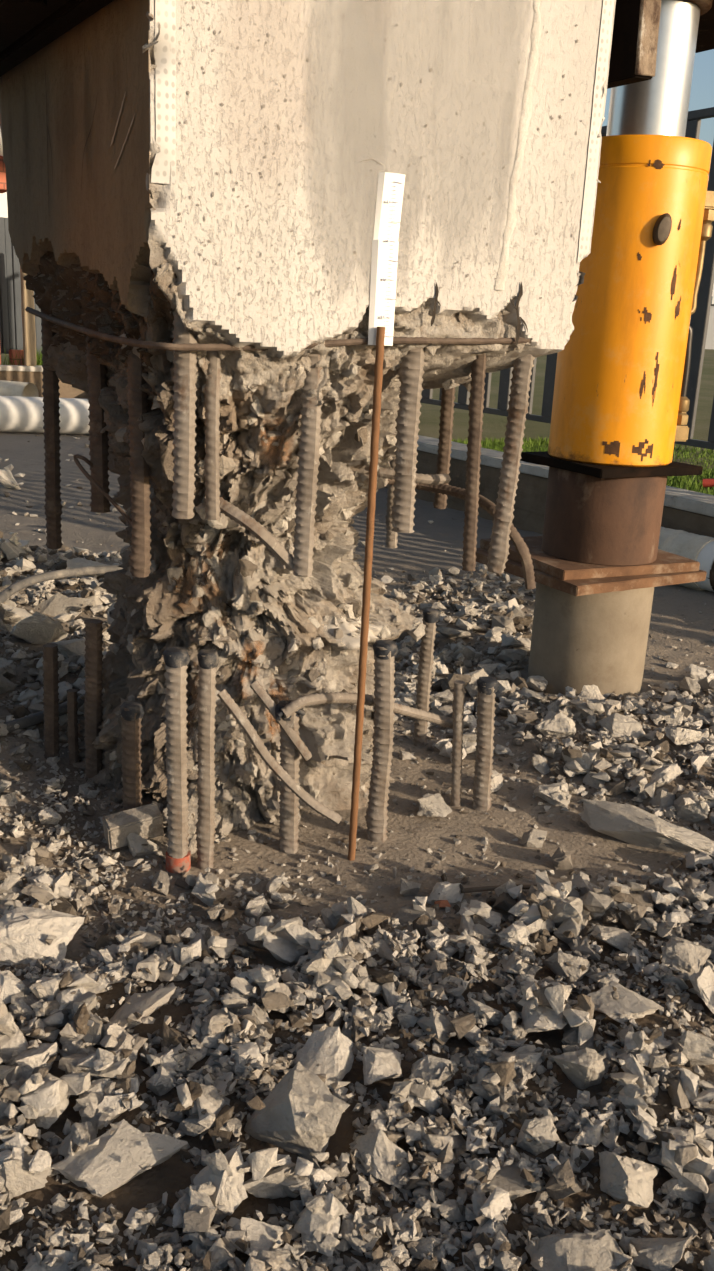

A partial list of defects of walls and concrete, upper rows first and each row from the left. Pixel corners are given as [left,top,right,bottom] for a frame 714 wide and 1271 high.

spalling [142,11,161,70]
peeling [485,0,548,290]
spalling [23,239,536,590]
spalling [42,643,60,759]
spalling [84,619,104,782]
spalling [163,608,499,878]